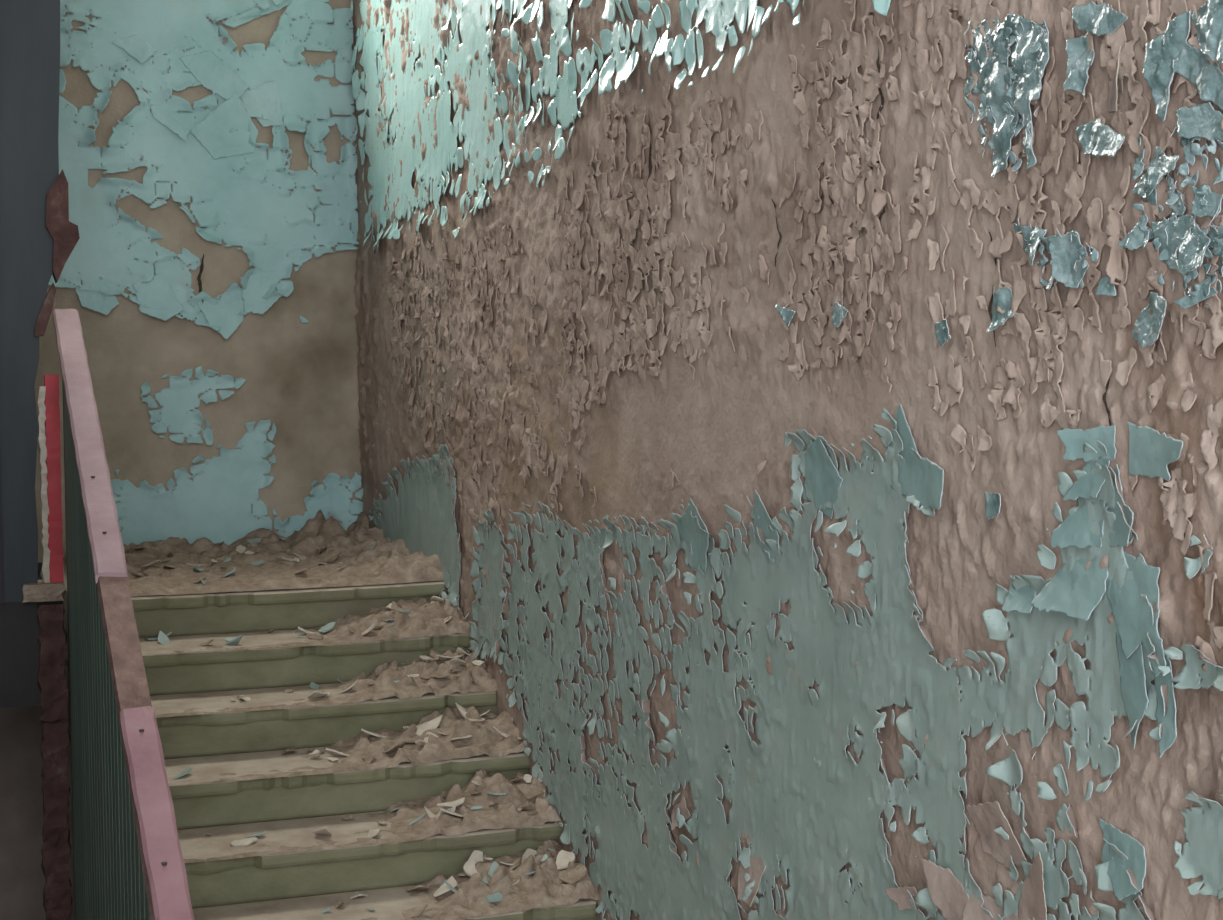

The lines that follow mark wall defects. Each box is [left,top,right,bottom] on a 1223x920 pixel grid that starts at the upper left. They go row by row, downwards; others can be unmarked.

spalling [215,6,287,55]
spalling [301,47,337,66]
spalling [59,59,101,112]
spalling [91,78,141,149]
spalling [172,85,213,108]
spalling [250,117,274,148]
spalling [284,126,312,171]
spalling [88,166,147,188]
spalling [45,169,80,283]
spalling [116,194,255,298]
peeling [140,366,246,446]
peeling [111,419,276,546]